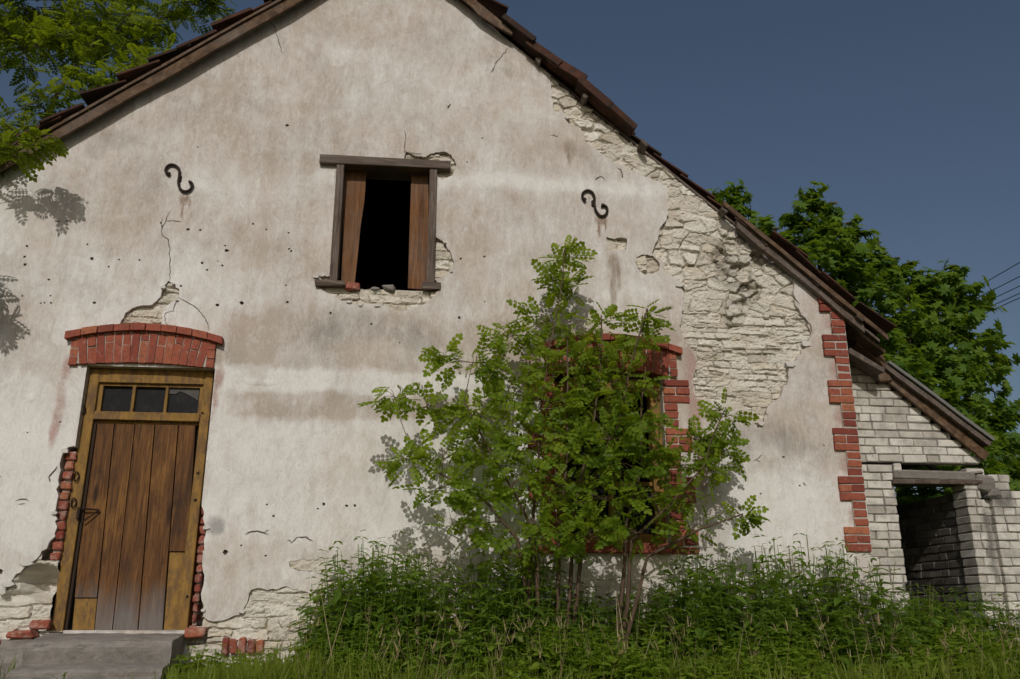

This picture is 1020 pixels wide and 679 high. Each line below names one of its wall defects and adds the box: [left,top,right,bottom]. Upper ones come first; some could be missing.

flaking render [404,154,455,179]
flaking render [122,282,182,324]
crack [161,217,174,276]
flaking render [313,239,462,312]
flaking render [550,78,811,428]
flaking render [0,552,63,639]
flaking render [186,559,359,673]